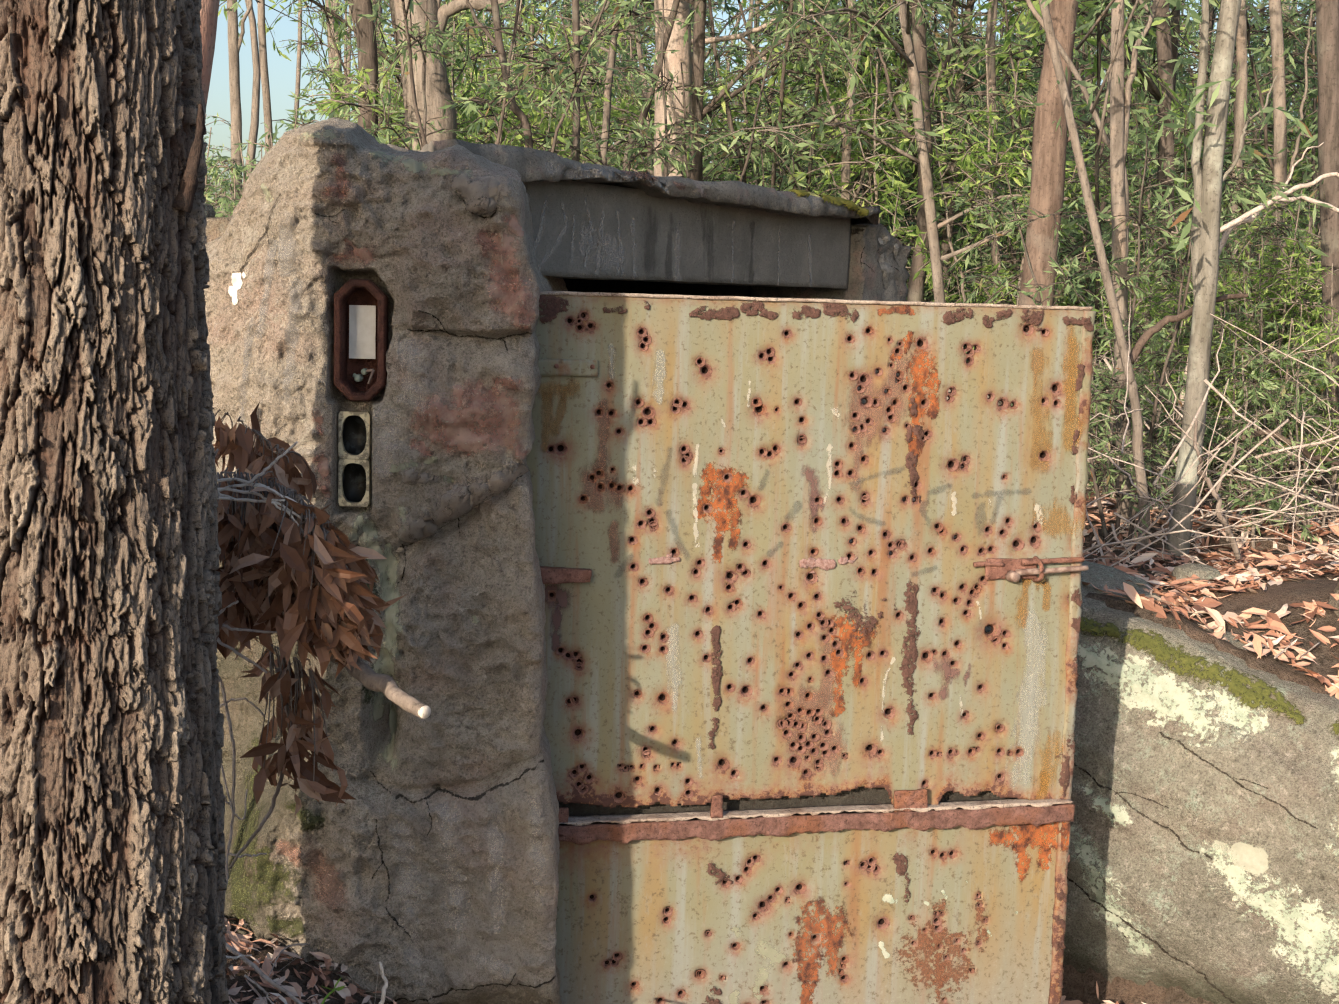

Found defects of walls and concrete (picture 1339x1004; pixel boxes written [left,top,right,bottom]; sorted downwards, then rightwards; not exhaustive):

rust [539,295,570,324]
rust [689,301,859,323]
rust [850,305,941,503]
rust [1032,316,1094,468]
rust [693,462,749,563]
rust [1071,588,1083,633]
rust [786,581,921,771]
rust [1037,733,1075,799]
crack [370,759,544,943]
rust [892,853,911,903]
rust [792,898,853,1004]
rust [895,899,989,1004]